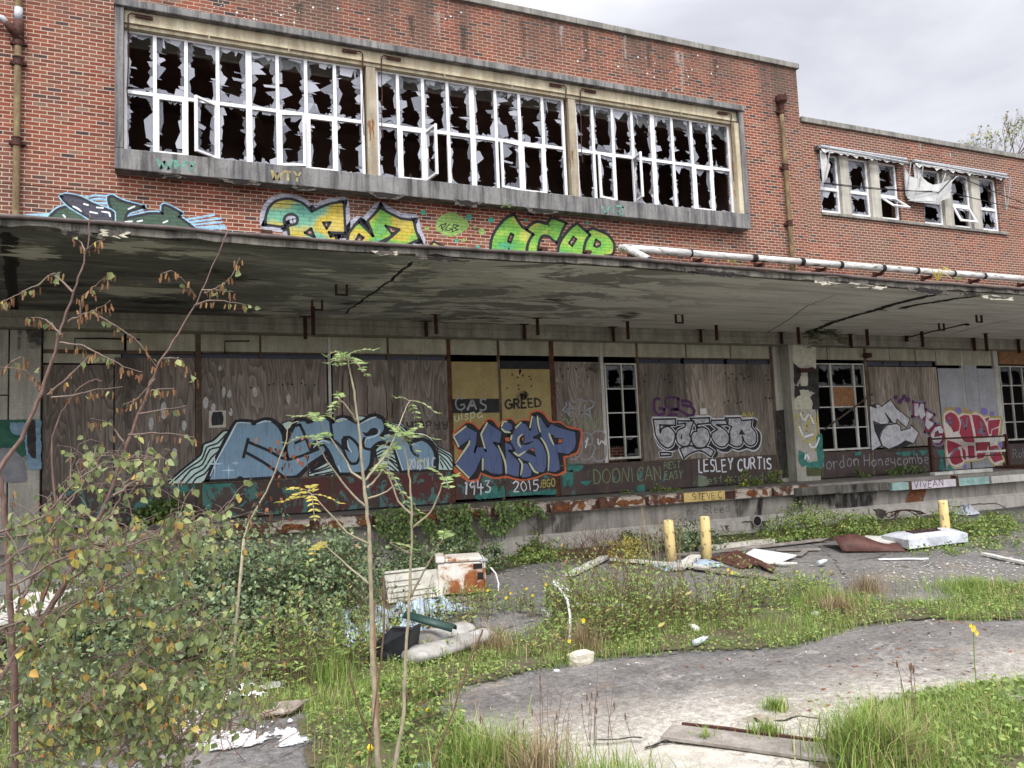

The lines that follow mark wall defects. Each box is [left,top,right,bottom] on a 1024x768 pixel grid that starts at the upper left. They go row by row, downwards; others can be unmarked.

damp [187,214,226,230]
crack [332,262,413,315]
crack [768,295,974,333]
peeling [793,345,820,410]
peeling [798,433,824,469]